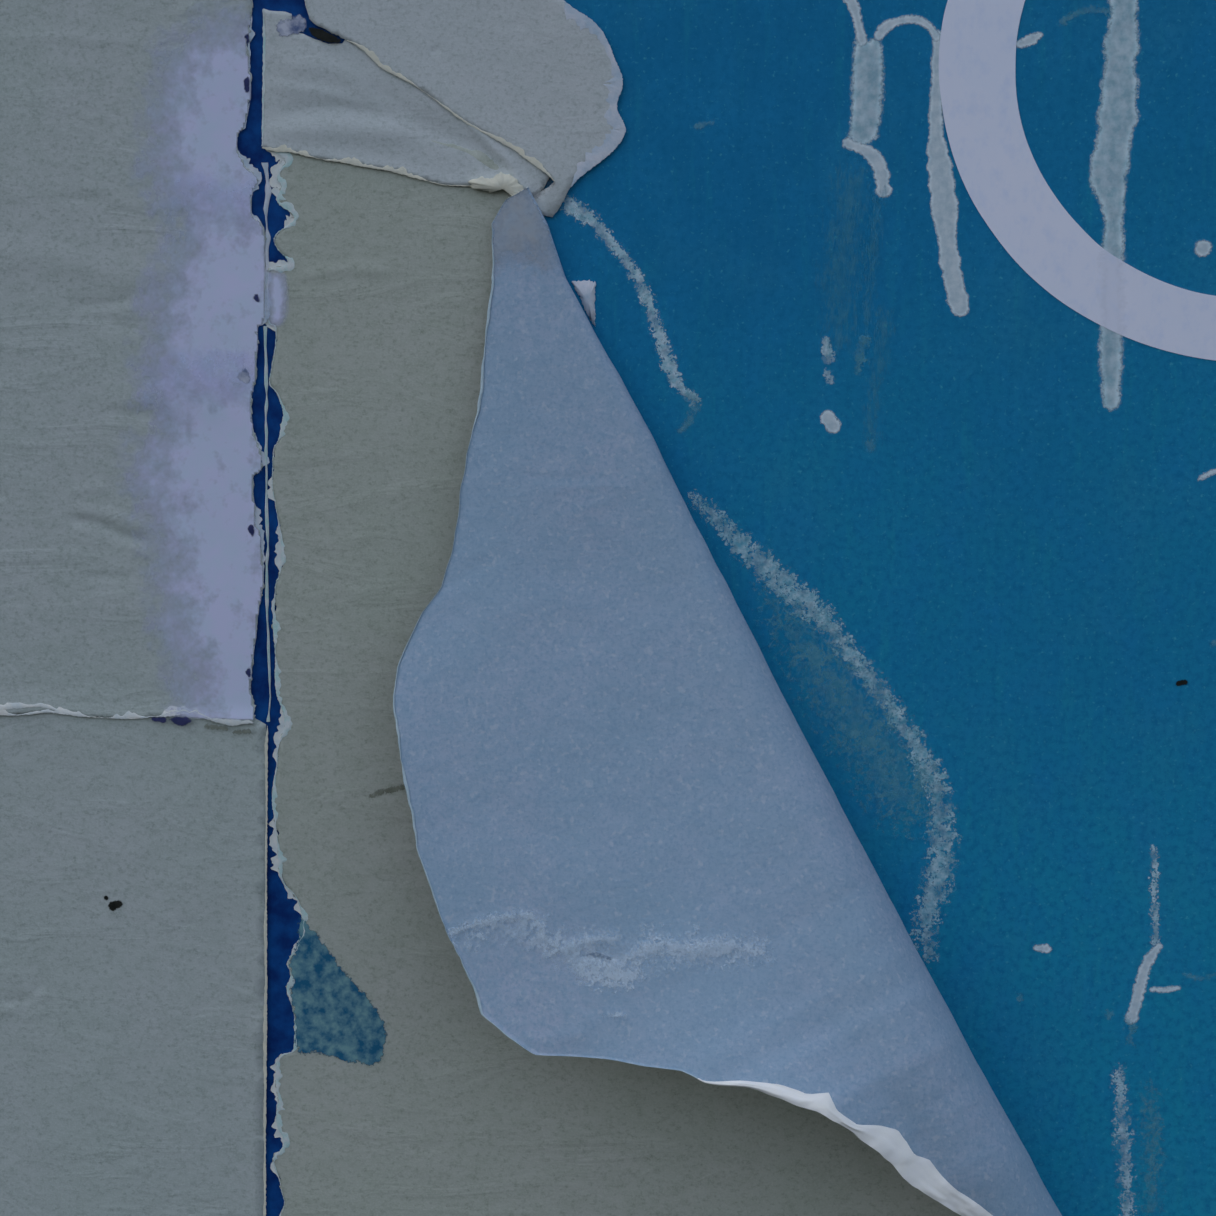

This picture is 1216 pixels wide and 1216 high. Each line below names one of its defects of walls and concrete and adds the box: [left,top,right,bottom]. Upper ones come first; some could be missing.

peeling [309,27,341,44]
peeling [563,198,585,224]
peeling [821,336,835,384]
peeling [452,913,768,992]